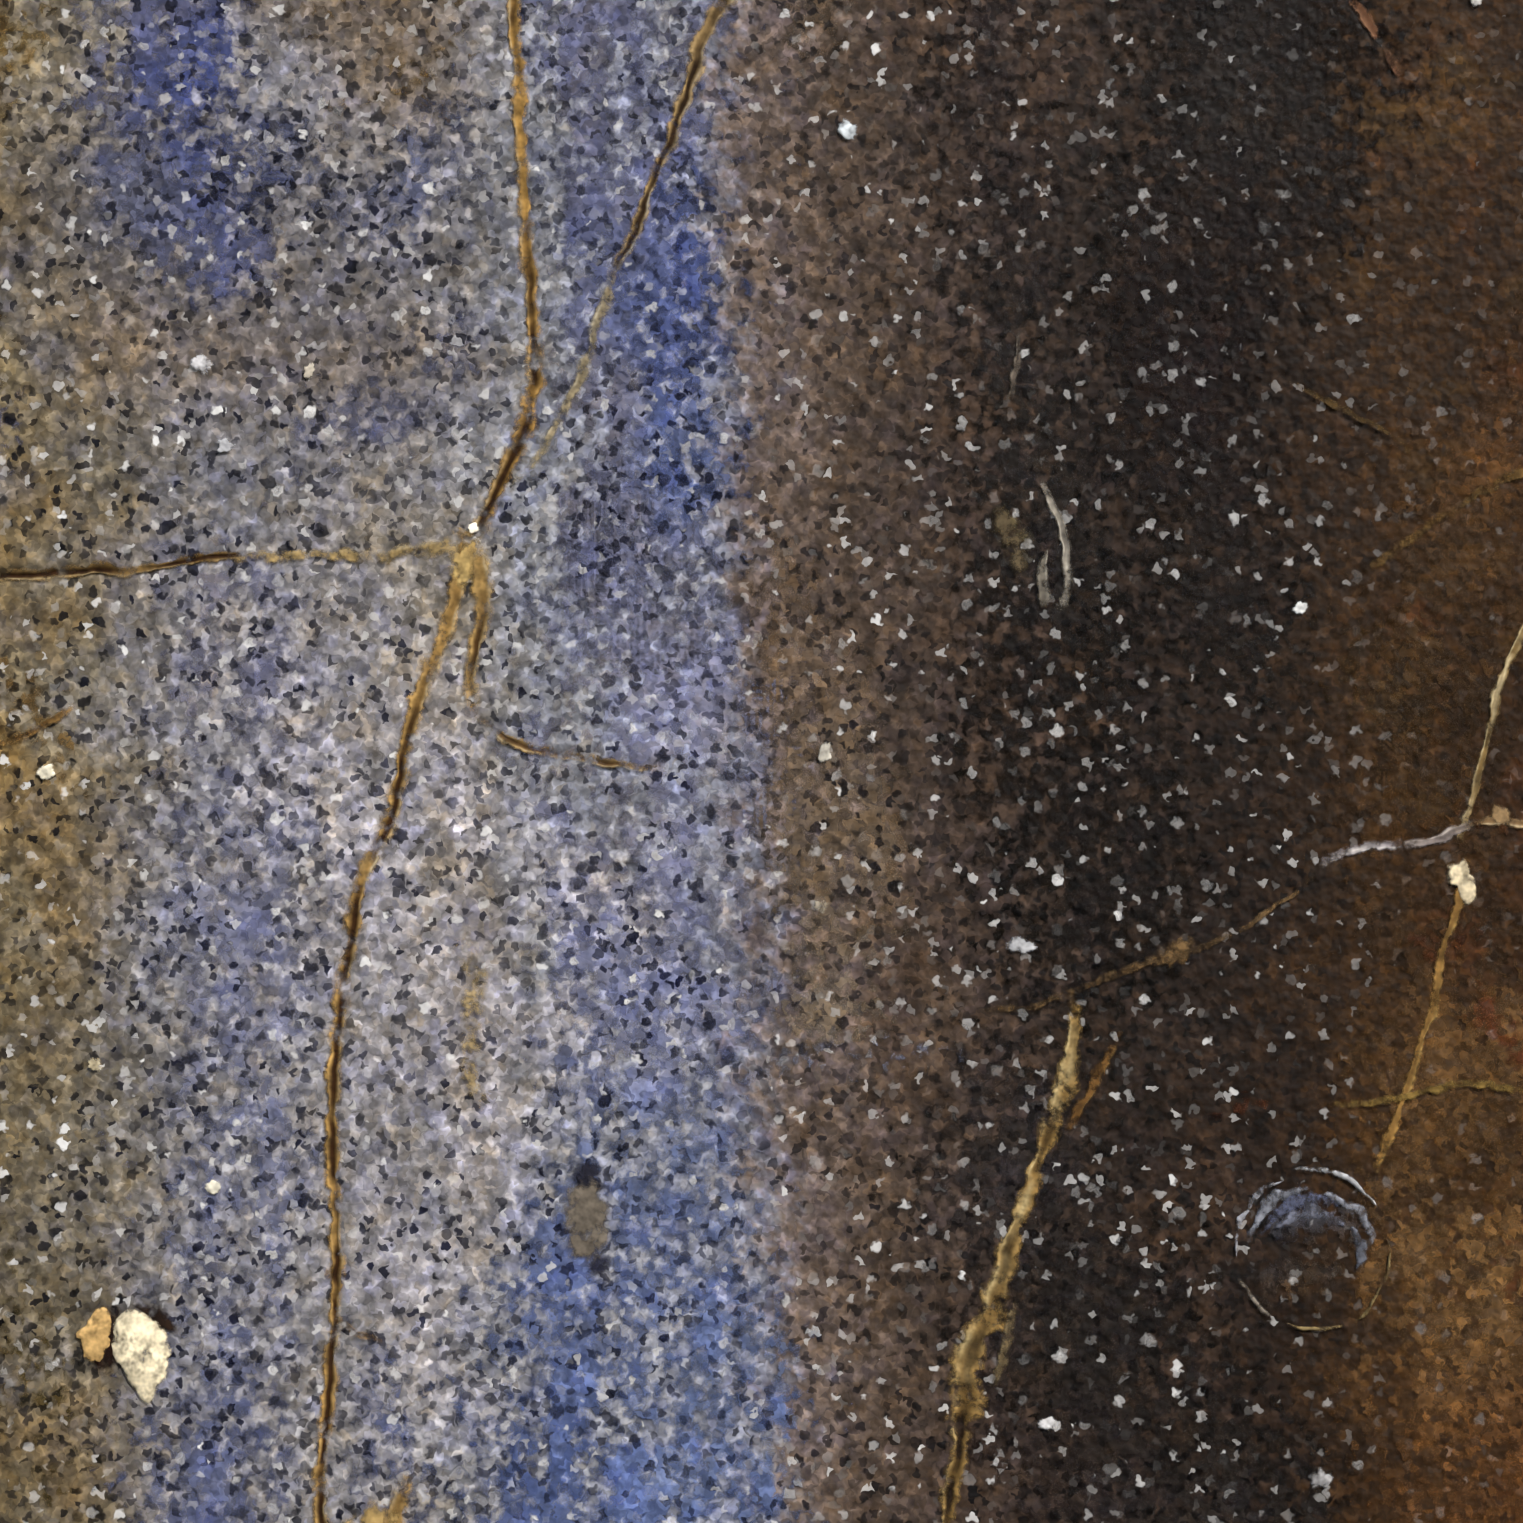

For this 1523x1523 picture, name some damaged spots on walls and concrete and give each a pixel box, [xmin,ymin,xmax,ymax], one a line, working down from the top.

crack [1304,389,1388,434]
crack [1373,468,1523,565]
crack [0,0,735,1523]
crack [1460,625,1523,834]
rust [1323,298,1523,1523]
crack [1351,889,1515,1165]
crack [942,892,1298,1523]